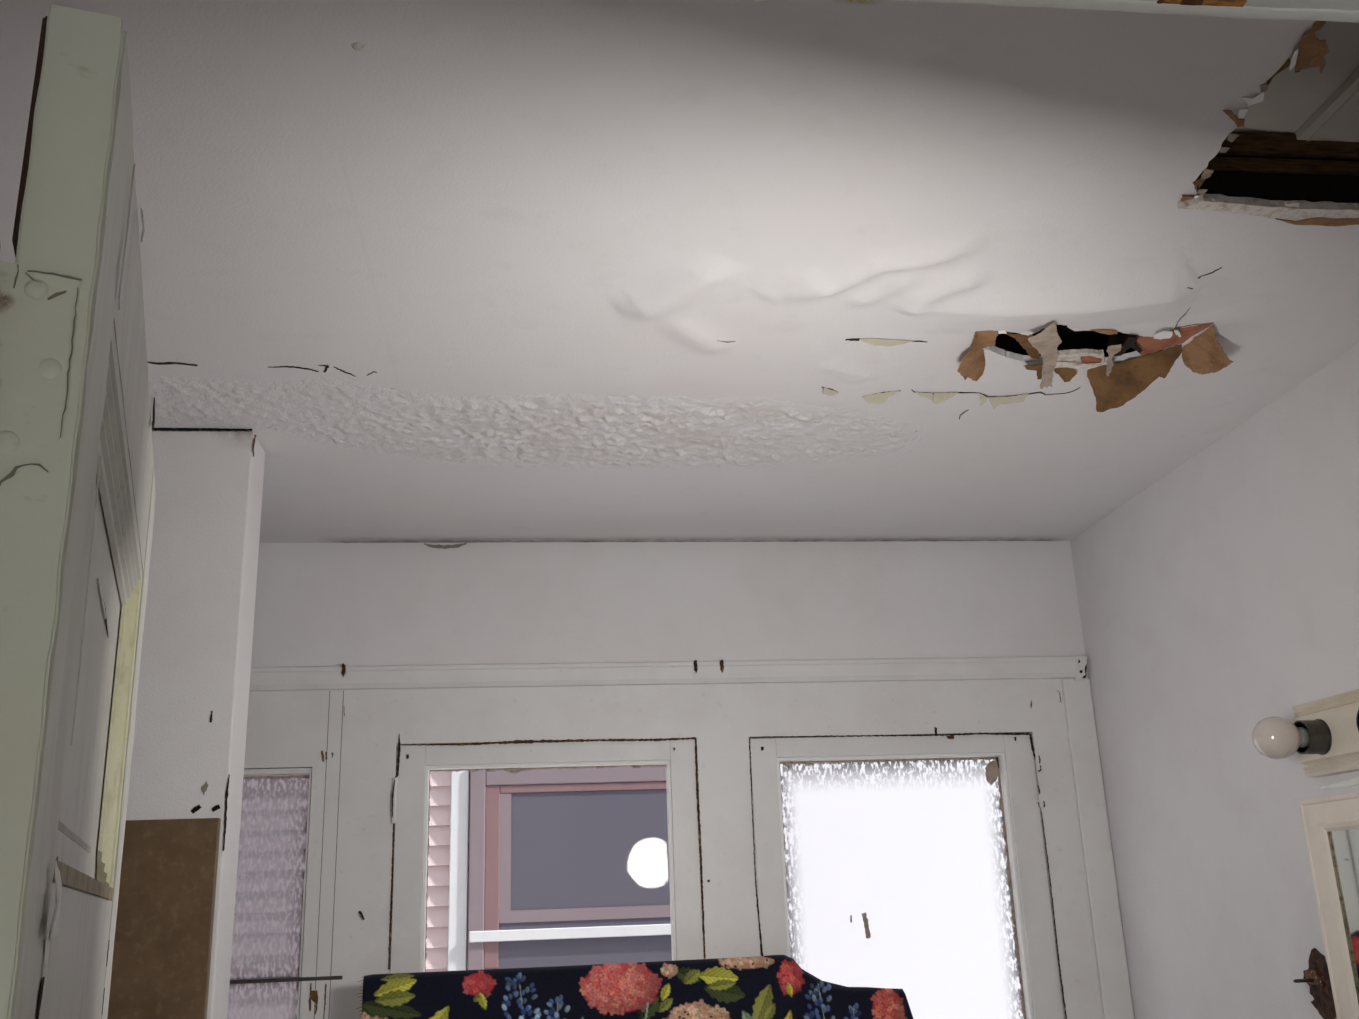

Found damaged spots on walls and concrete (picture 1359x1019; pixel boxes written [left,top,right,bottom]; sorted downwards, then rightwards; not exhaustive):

crack [147,360,198,368]
crack [268,365,377,377]
spalling [1023,349,1105,369]
peeling [863,387,1080,409]
peeling [36,857,62,1019]